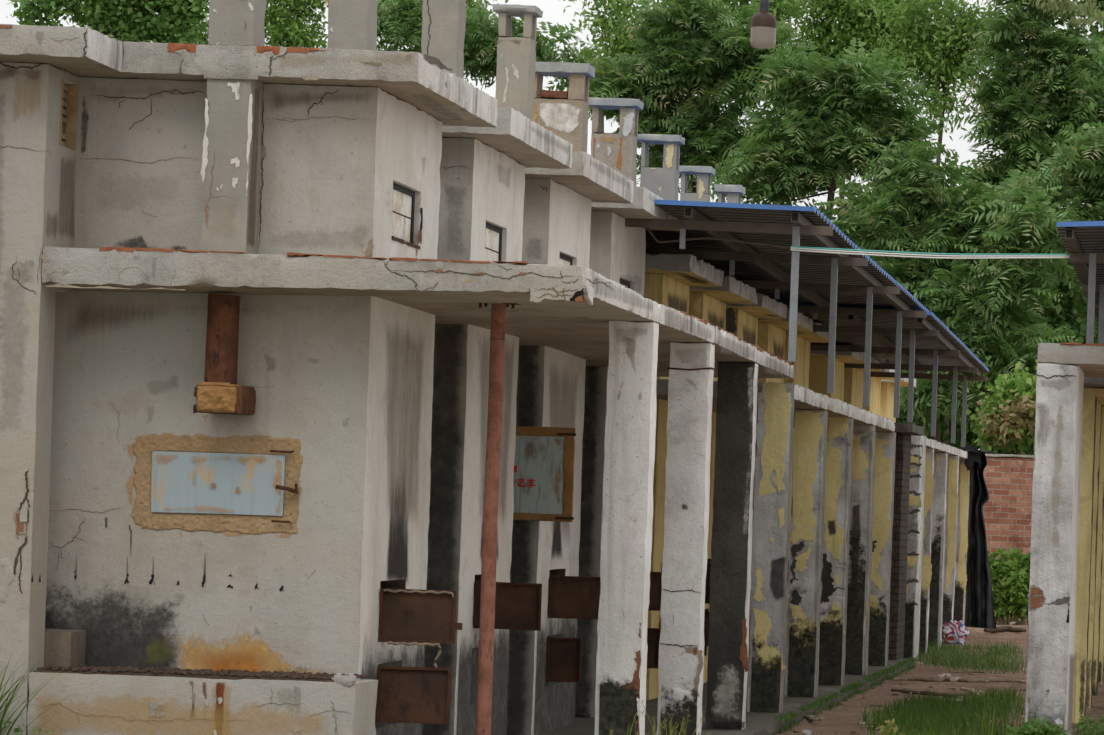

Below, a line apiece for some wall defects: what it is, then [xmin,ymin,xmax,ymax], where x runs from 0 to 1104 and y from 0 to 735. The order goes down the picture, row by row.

peeling [216,82,266,197]
crack [241,0,359,244]
crack [384,261,613,293]
leakage [426,324,462,591]
crack [13,469,121,594]
peeling [739,381,892,672]
peeling [906,448,969,594]
corrosion [179,634,289,735]
leakage [424,643,453,676]
spalling [623,623,641,735]
leakage [660,688,697,735]
leakage [710,505,887,728]